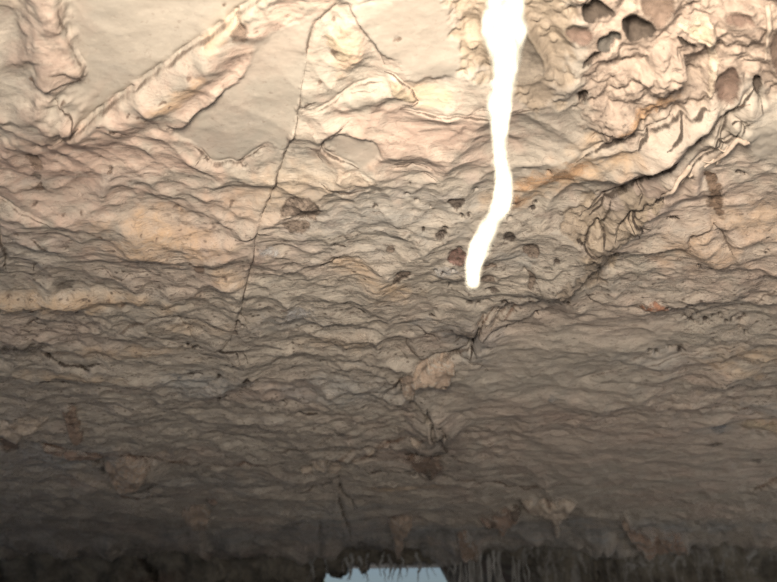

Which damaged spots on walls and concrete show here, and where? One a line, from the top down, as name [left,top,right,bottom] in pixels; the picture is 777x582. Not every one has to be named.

crack [46,90,73,134]
crack [262,32,316,213]
crack [576,201,611,260]
crack [631,210,650,239]
crack [218,236,256,390]
crack [397,313,436,358]
crack [459,301,552,370]